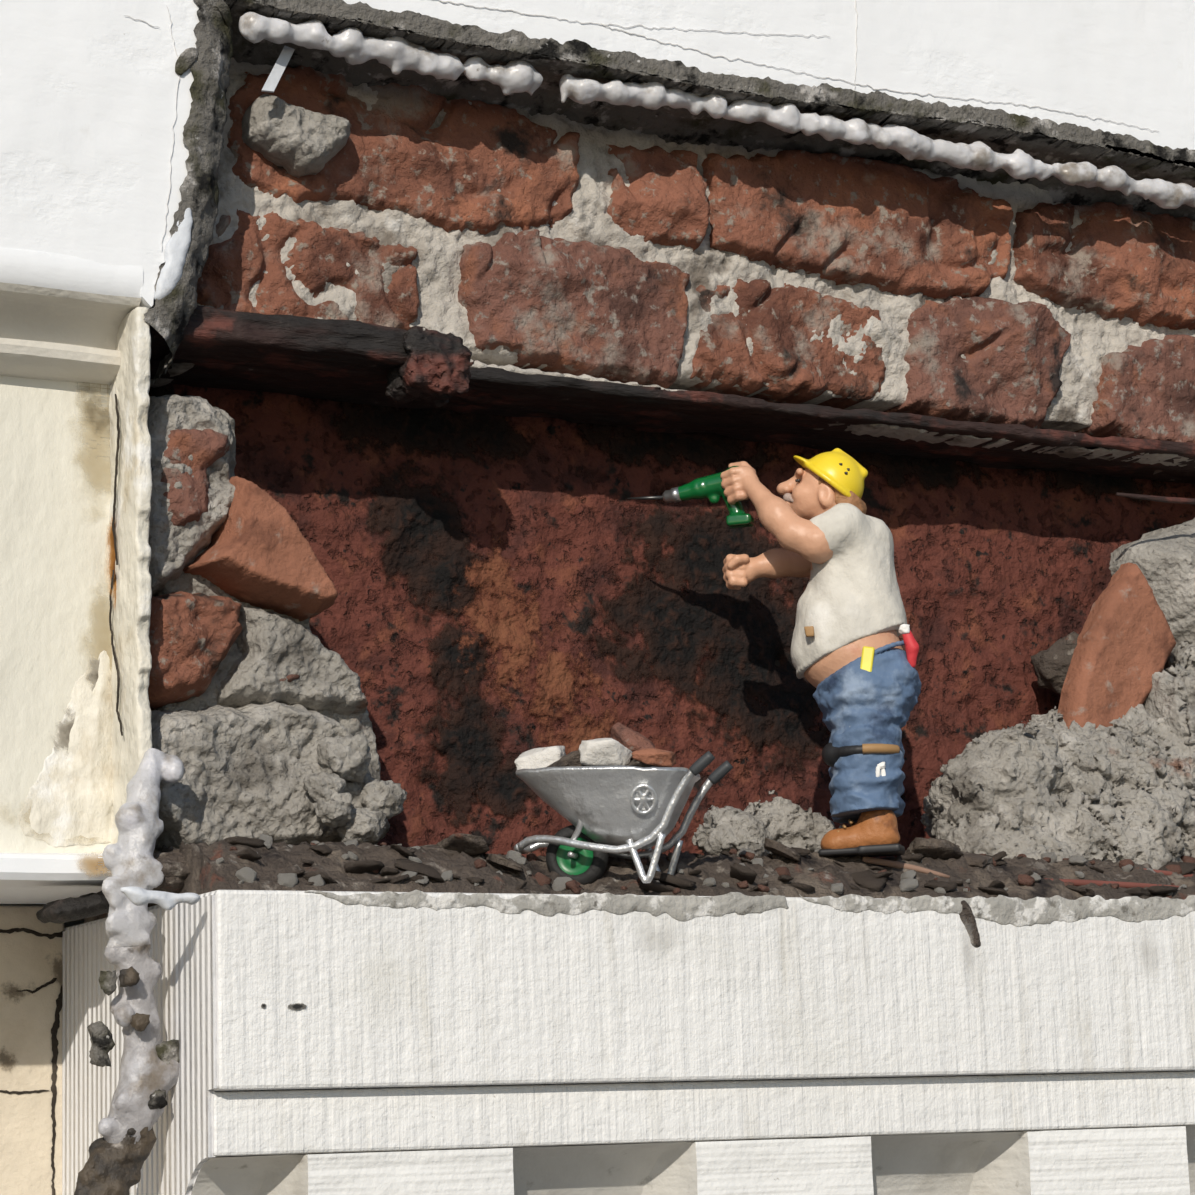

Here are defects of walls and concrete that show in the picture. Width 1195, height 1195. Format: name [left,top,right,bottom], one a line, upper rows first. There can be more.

crack [109,394,123,736]
leakage [334,401,541,827]
flaking render [108,0,1195,852]
leakage [551,420,831,771]
leakage [824,450,1166,504]
crack [0,924,79,939]
peeling [121,886,200,910]
peeling [304,890,1195,927]
crack [0,978,63,1195]